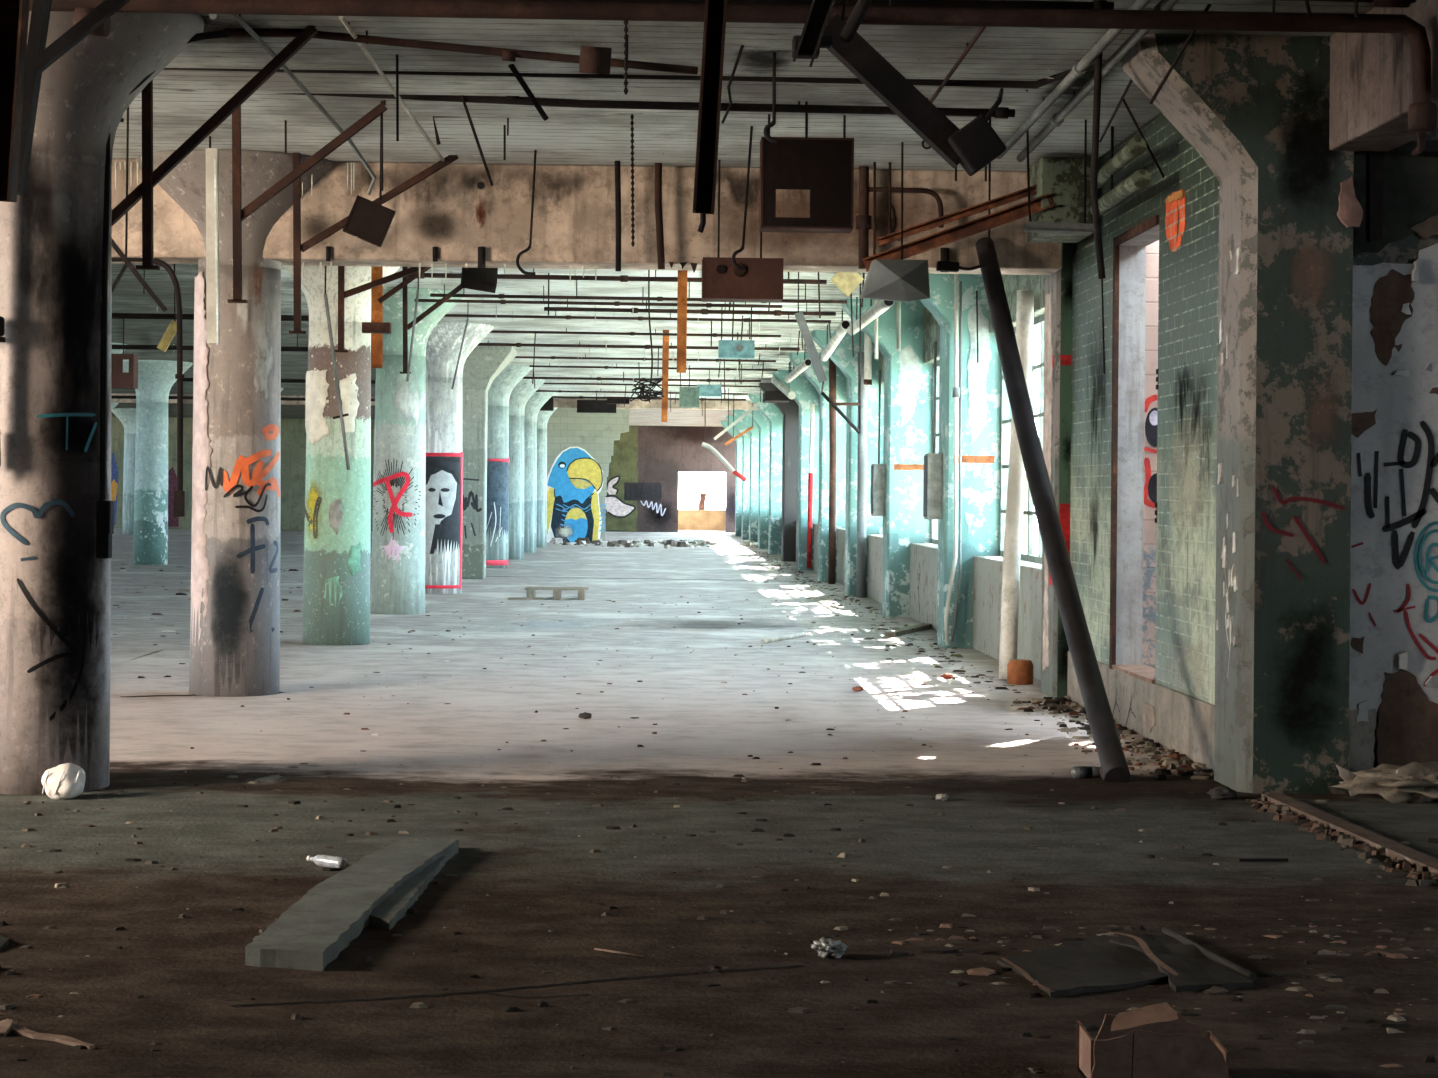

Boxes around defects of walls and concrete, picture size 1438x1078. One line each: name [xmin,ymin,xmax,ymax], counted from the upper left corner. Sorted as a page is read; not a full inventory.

peeling [1337,176,1363,227]
peeling [305,349,368,445]
peeling [897,345,925,447]
peeling [967,305,992,445]
peeling [1369,259,1438,394]
peeling [1349,651,1438,770]